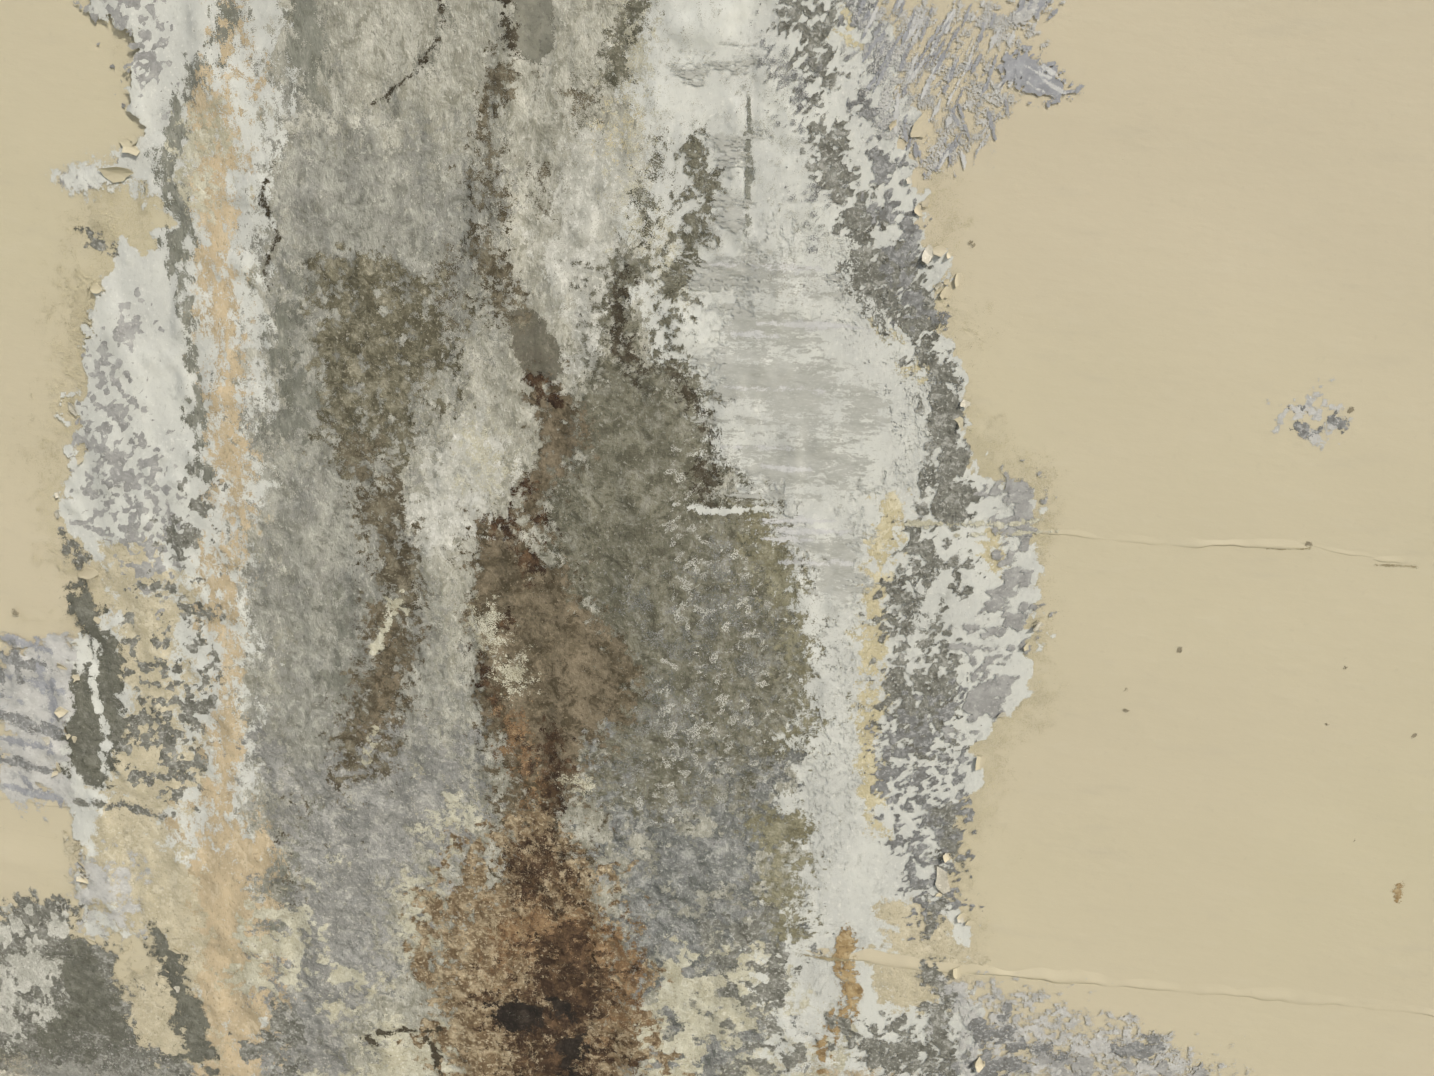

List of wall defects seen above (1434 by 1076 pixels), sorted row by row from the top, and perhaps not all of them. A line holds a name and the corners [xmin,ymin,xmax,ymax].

peeling [1265,377,1353,451]
water stain [214,0,888,1076]
peeling [566,584,620,656]
corrosion [395,358,695,1076]
peeling [565,714,620,777]
spalling [469,984,593,1076]